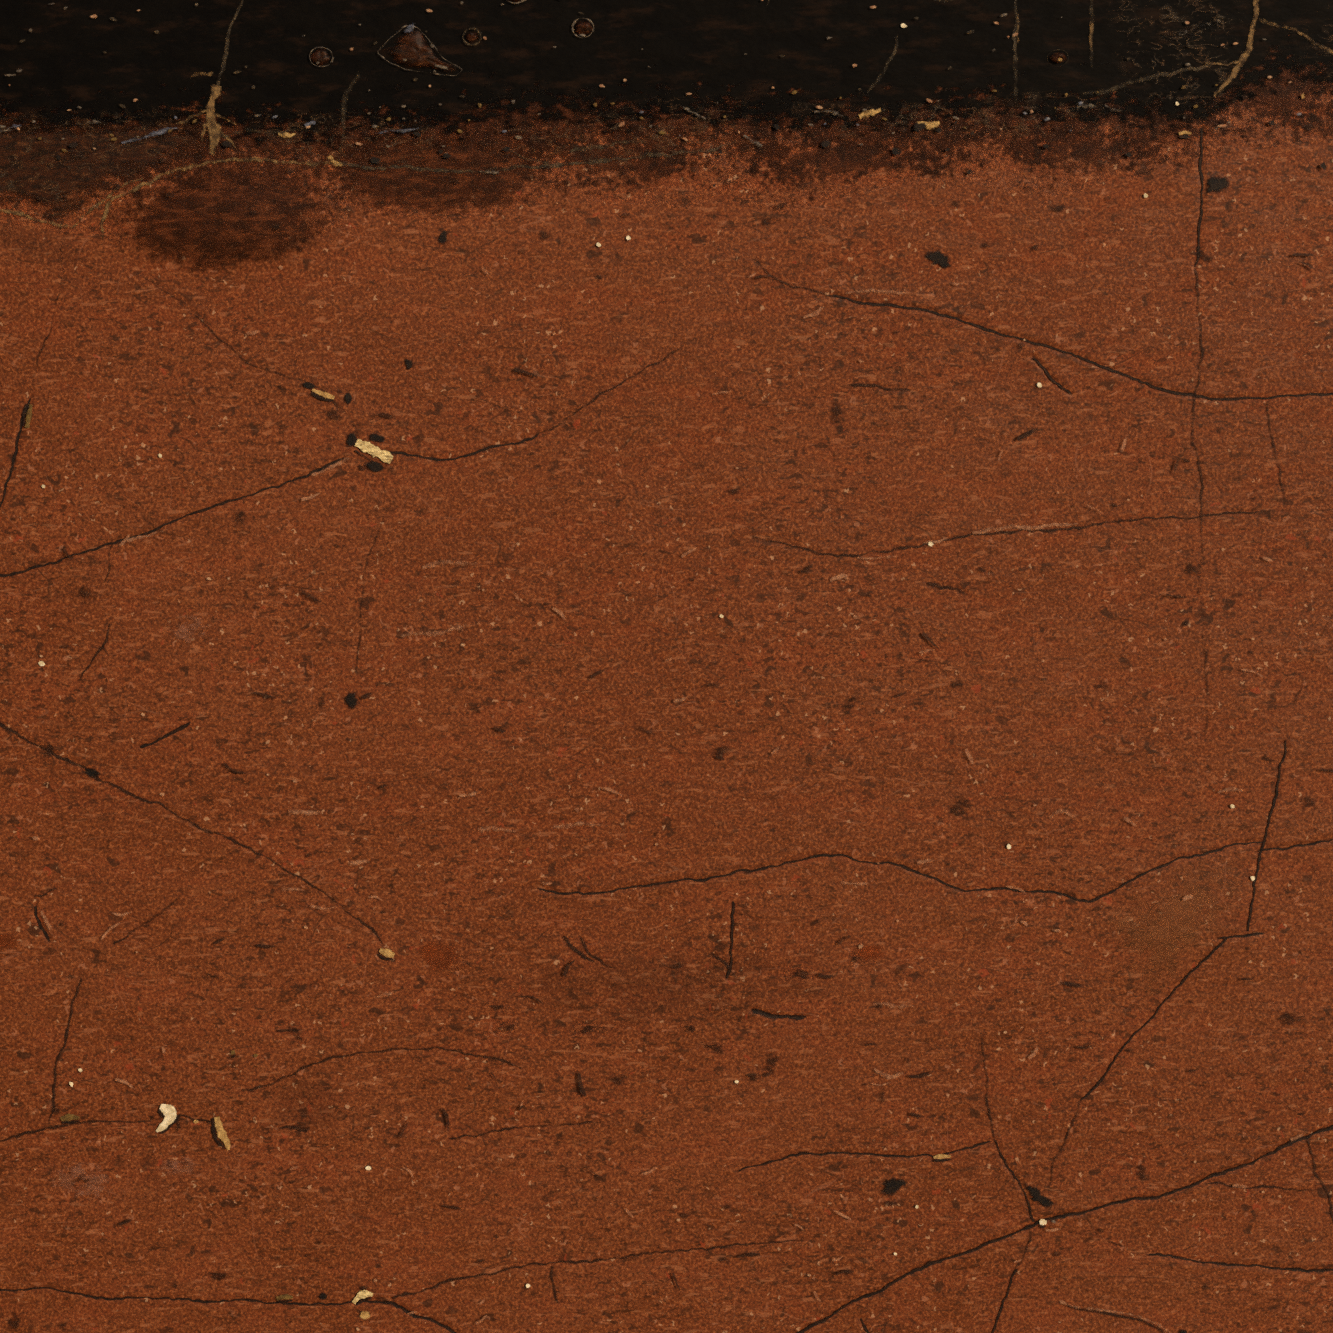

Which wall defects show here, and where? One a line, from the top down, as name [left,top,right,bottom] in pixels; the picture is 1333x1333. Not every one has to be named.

crack [1087,9,1095,52]
crack [1100,0,1333,97]
damp [0,65,1333,271]
crack [753,128,1333,559]
crack [0,398,31,507]
crack [389,350,678,461]
crack [0,458,345,581]
crack [0,723,383,944]
crack [0,978,207,1141]
crack [242,1047,522,1091]
crack [537,740,1333,1333]
crack [0,1240,802,1333]